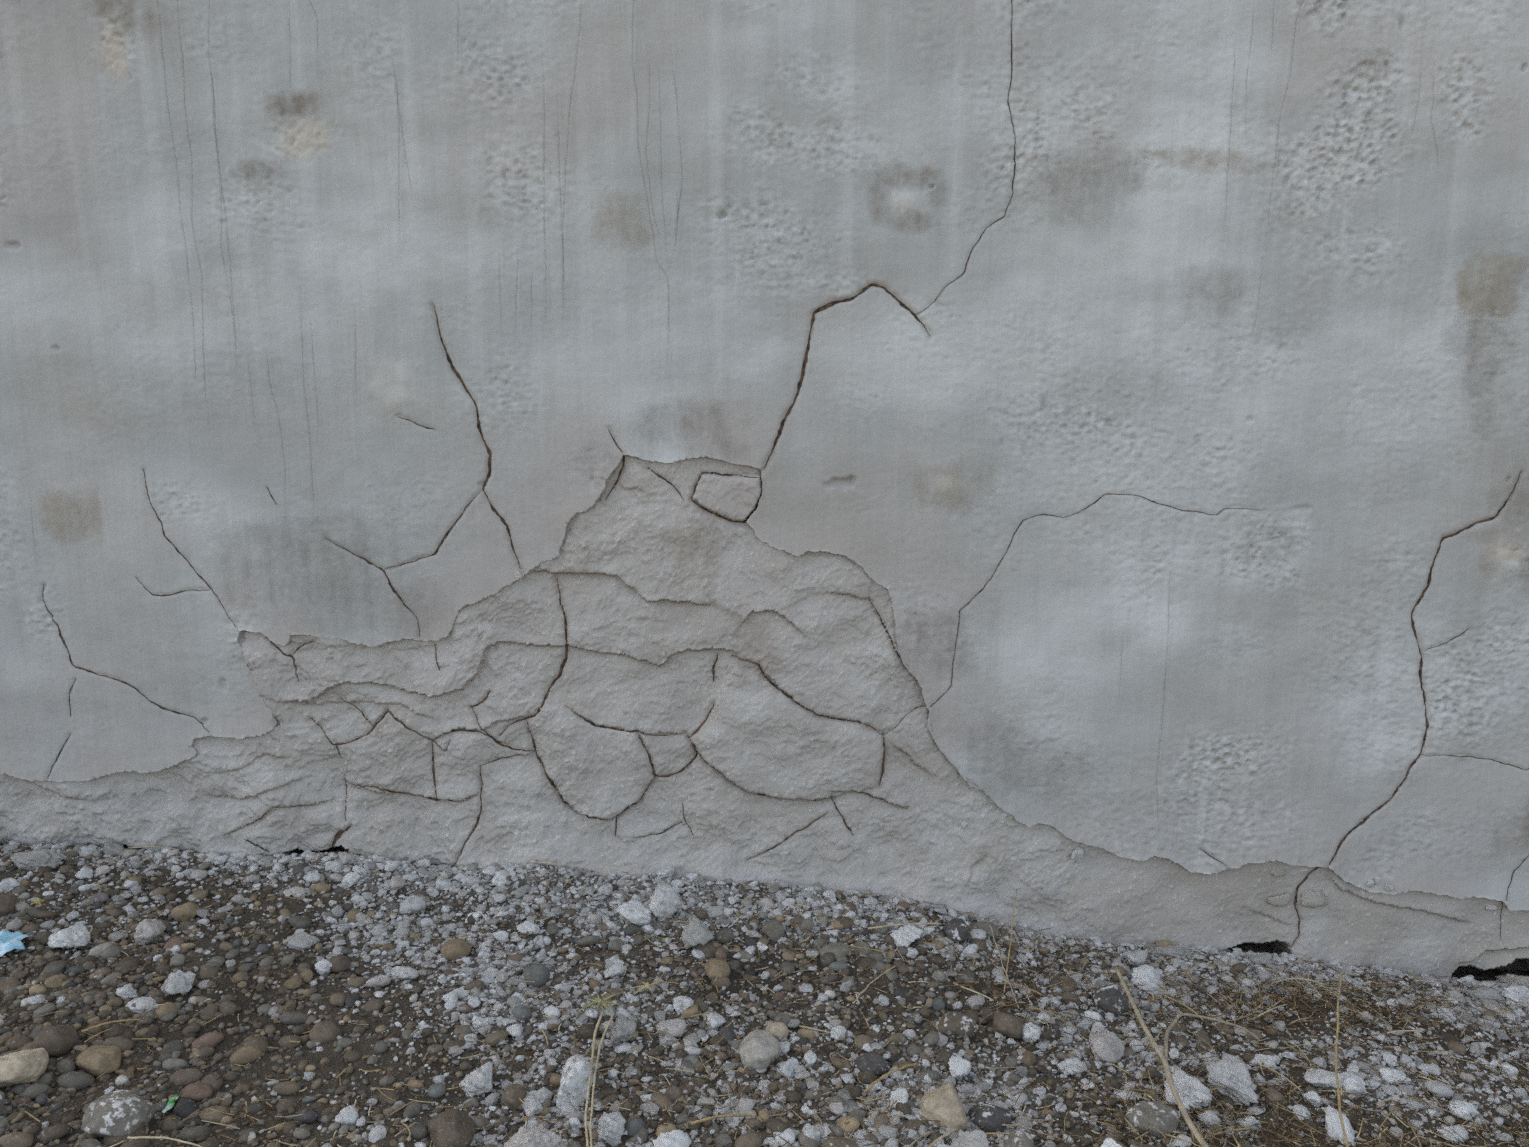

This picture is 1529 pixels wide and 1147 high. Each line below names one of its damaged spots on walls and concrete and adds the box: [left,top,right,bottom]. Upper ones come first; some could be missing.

crack [607,0,1016,523]
crack [42,586,209,776]
crack [137,470,236,627]
crack [326,307,521,671]
crack [228,493,1257,864]
flaking render [0,455,1529,978]
crack [1291,472,1529,948]